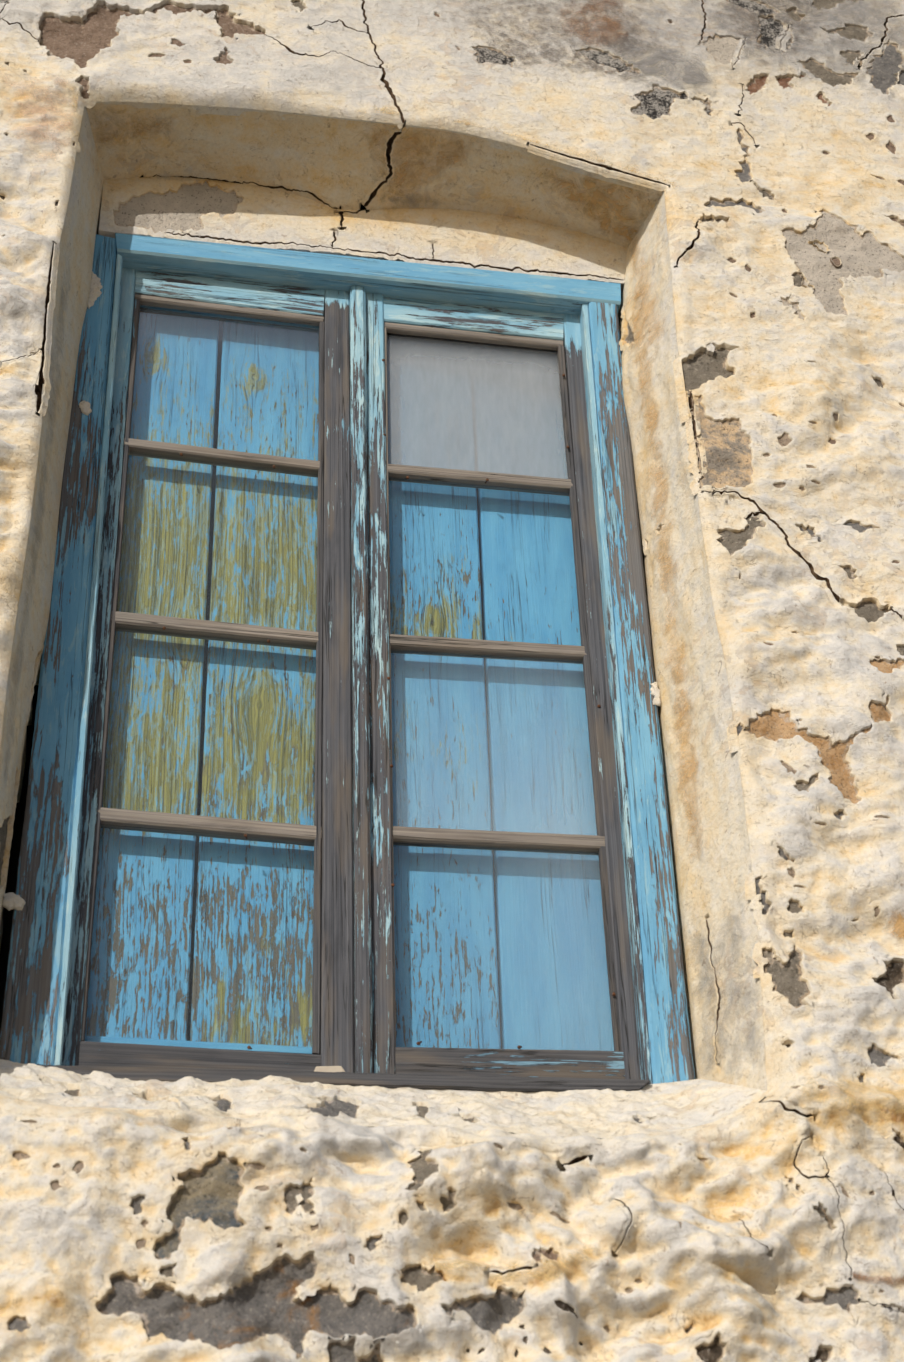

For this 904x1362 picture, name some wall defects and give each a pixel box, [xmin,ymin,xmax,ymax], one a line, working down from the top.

crack [1,242,60,417]
spalling [0,0,272,109]
crack [143,0,625,283]
crack [527,142,669,191]
crack [670,219,706,267]
spalling [692,0,904,159]
spalling [693,124,904,325]
crack [685,390,850,607]
spalling [673,338,904,833]
spalling [745,838,821,1056]
spalling [86,1085,617,1362]
crack [751,1096,904,1318]